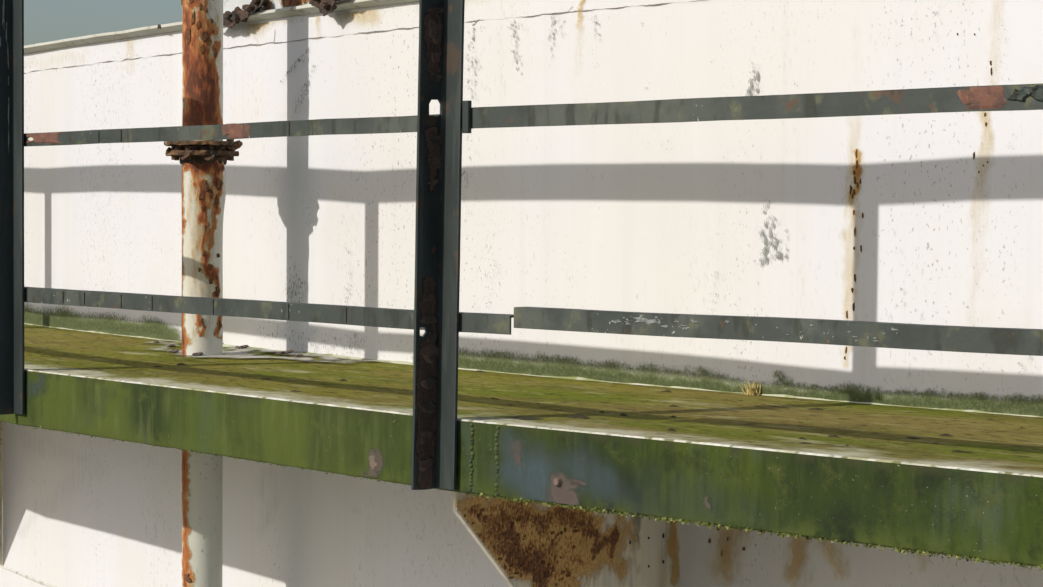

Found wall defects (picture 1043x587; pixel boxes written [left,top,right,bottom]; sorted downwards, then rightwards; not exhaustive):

crack [223,27,418,49]
corrosion [422,7,444,82]
crack [468,0,706,26]
corrosion [166,0,346,298]
corrosion [849,149,864,252]
peeling [957,85,1043,110]
corrosion [182,313,222,356]
corrosion [415,276,439,489]
corrosion [182,450,195,587]
corrosion [456,473,679,587]